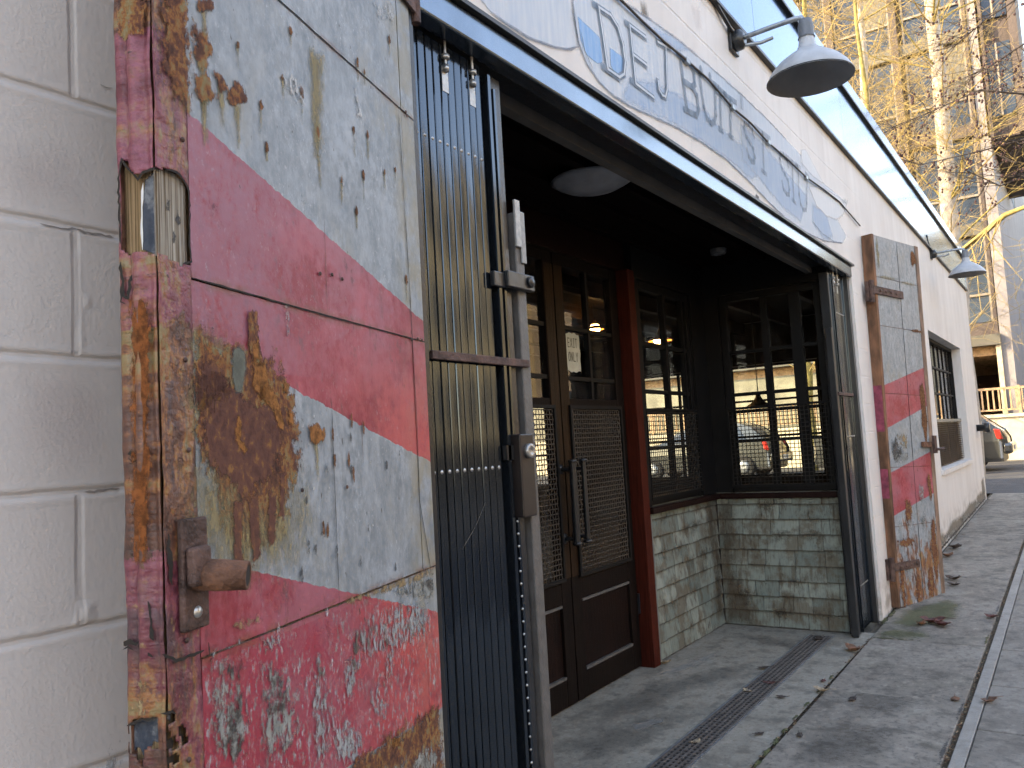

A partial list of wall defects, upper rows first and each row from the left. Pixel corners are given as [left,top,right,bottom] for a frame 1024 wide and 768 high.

corrosion [115,0,264,143]
corrosion [128,299,153,565]
corrosion [181,309,326,568]
peeling [326,414,365,483]
corrosion [897,499,914,547]
corrosion [900,516,939,608]
peeling [211,628,300,764]
peeling [306,563,433,764]
corrosion [352,705,445,768]